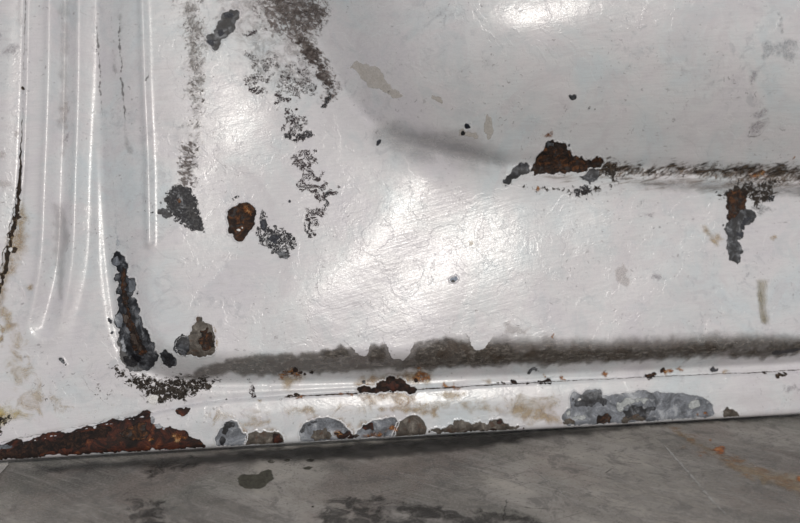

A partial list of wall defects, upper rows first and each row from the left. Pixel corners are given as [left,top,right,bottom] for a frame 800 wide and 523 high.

peeling [204,8,243,53]
crack [0,122,22,293]
peeling [144,141,205,233]
rust [712,171,783,264]
peeling [108,249,218,374]
peeling [324,331,446,361]
peeling [465,330,494,350]
rust [0,410,206,460]
peeling [213,418,286,448]
peeling [297,413,429,443]
peeling [350,373,419,404]
peeling [560,387,741,427]